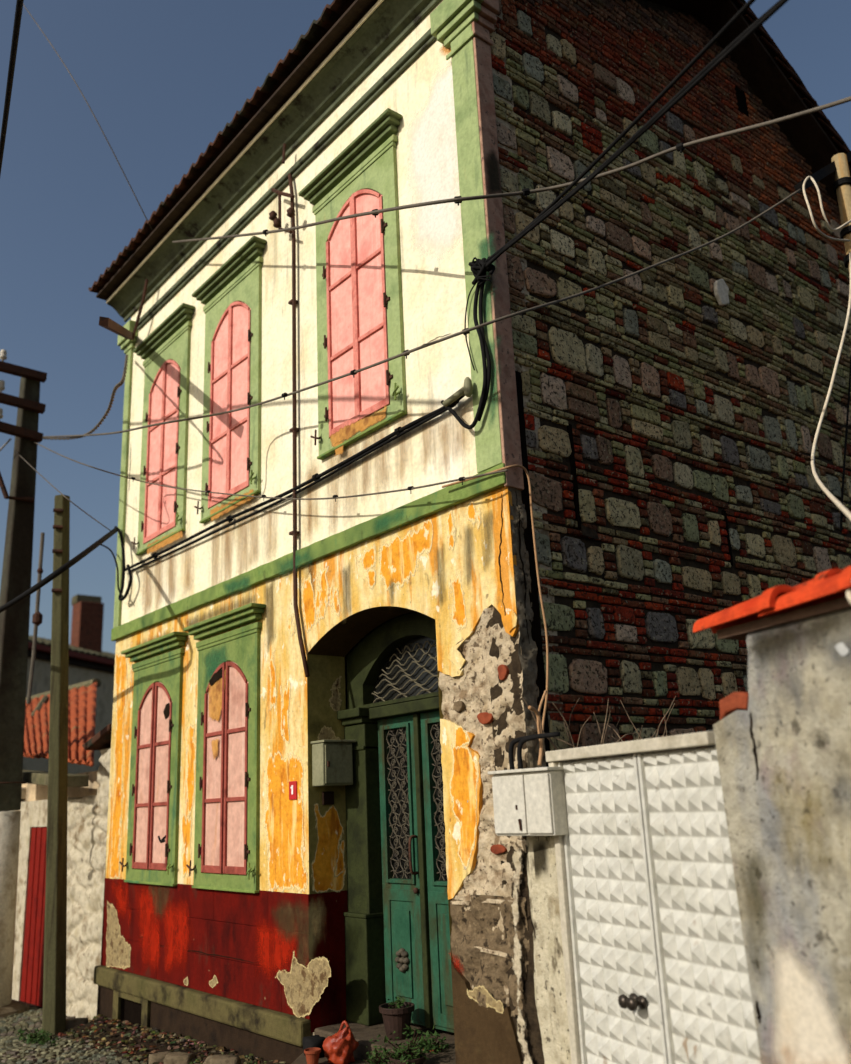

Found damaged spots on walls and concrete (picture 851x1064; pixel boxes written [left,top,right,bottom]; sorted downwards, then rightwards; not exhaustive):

peeling [355,519,433,590]
leakage [187,579,273,647]
peeling [287,568,340,636]
peeling [106,653,189,969]
peeling [264,649,346,893]
flaking render [438,570,532,1064]
flaking render [258,926,331,1018]